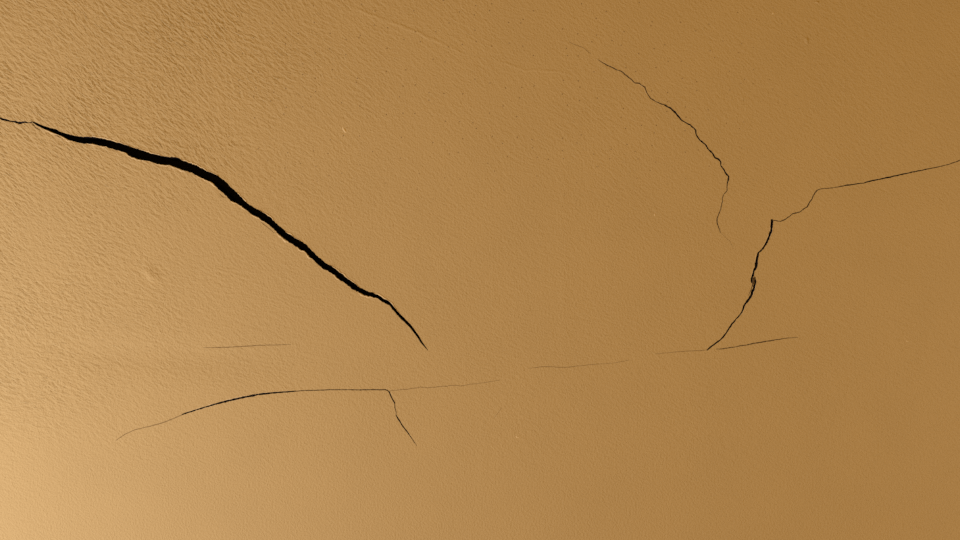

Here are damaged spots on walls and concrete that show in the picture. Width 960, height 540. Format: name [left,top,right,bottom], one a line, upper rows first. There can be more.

crack [0,117,428,350]
crack [570,42,734,249]
crack [660,160,960,354]
crack [117,380,498,446]